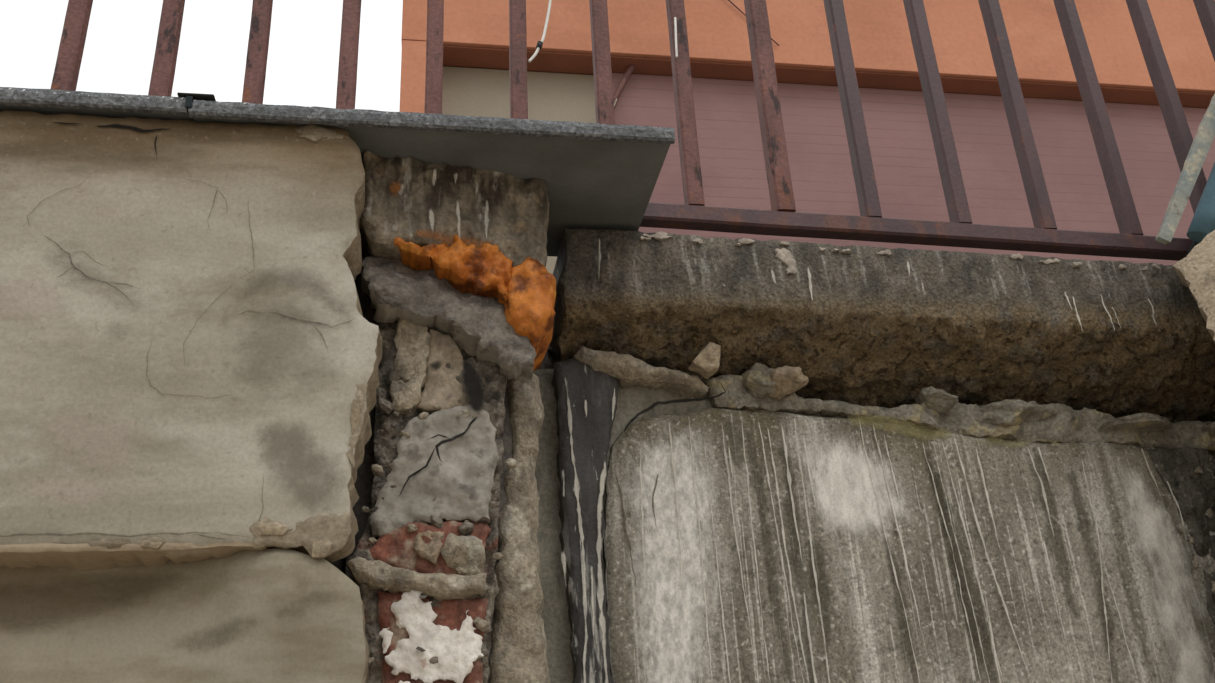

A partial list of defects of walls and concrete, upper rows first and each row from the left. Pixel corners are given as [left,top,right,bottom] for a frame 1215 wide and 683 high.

crack [53,122,165,155]
crack [27,181,134,301]
crack [183,179,352,360]
spalling [639,231,674,241]
spalling [774,241,798,274]
peeling [379,590,484,683]
crack [399,417,477,496]
leakage [562,378,608,683]
leakage [629,416,770,683]
leakage [758,419,927,683]
leakage [1122,449,1215,683]
spalling [1143,447,1215,625]